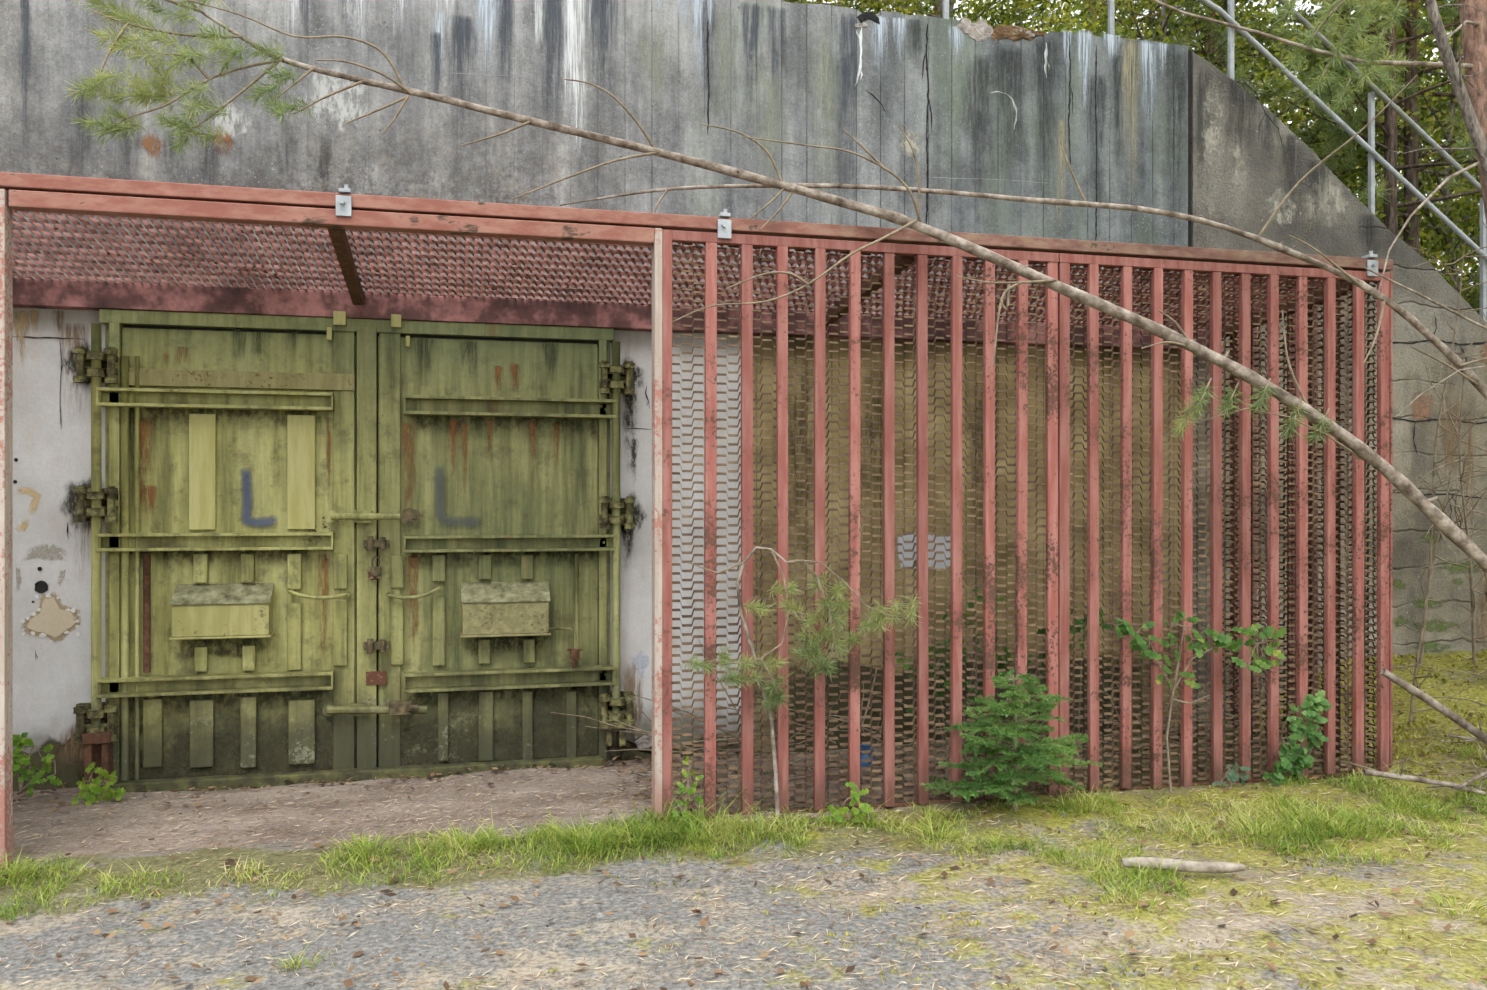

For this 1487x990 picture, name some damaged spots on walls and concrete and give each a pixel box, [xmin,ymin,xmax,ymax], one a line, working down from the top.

damp [20,0,28,92]
damp [433,0,512,89]
damp [535,0,615,138]
damp [658,0,729,74]
damp [743,4,784,66]
damp [841,17,857,110]
damp [875,16,920,54]
damp [949,26,962,52]
spalling [956,18,1046,42]
damp [1037,31,1121,198]
corrosion [129,414,156,508]
peeling [20,591,81,642]